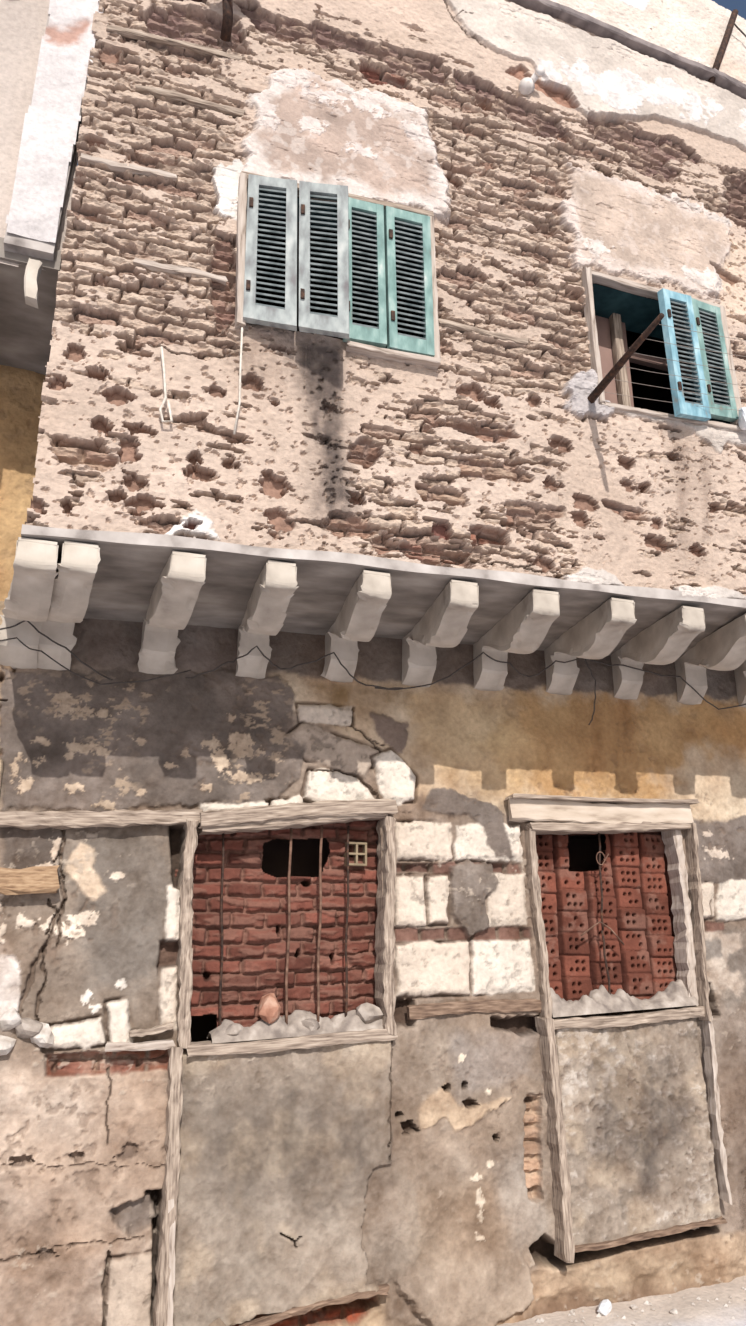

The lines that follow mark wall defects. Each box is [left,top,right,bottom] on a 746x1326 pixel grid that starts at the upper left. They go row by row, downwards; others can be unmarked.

peeling [137,0,746,228]
spalling [210,233,236,336]
spalling [51,342,166,522]
flaking render [183,450,240,482]
flaking render [258,469,296,540]
water stain [303,348,345,510]
spalling [323,382,671,569]
peeling [0,665,307,812]
crack [19,829,68,1021]
peeling [0,836,126,939]
crack [0,1065,165,1167]
crack [0,1235,145,1326]